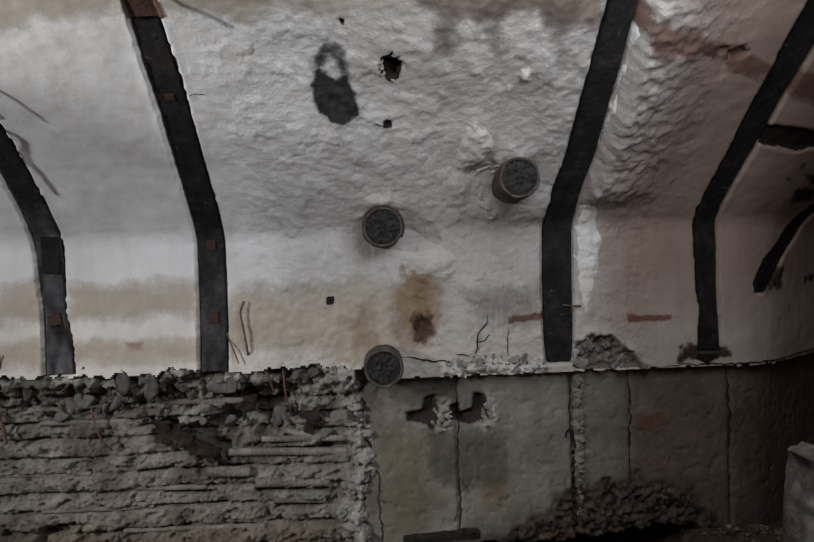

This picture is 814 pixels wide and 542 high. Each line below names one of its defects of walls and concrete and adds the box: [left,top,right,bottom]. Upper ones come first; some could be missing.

damp [315,43,348,85]
spalling [379,52,403,82]
spalling [570,335,647,372]
spalling [407,393,495,430]
crack [403,315,532,529]
spalling [0,363,376,542]
spalling [501,476,715,542]